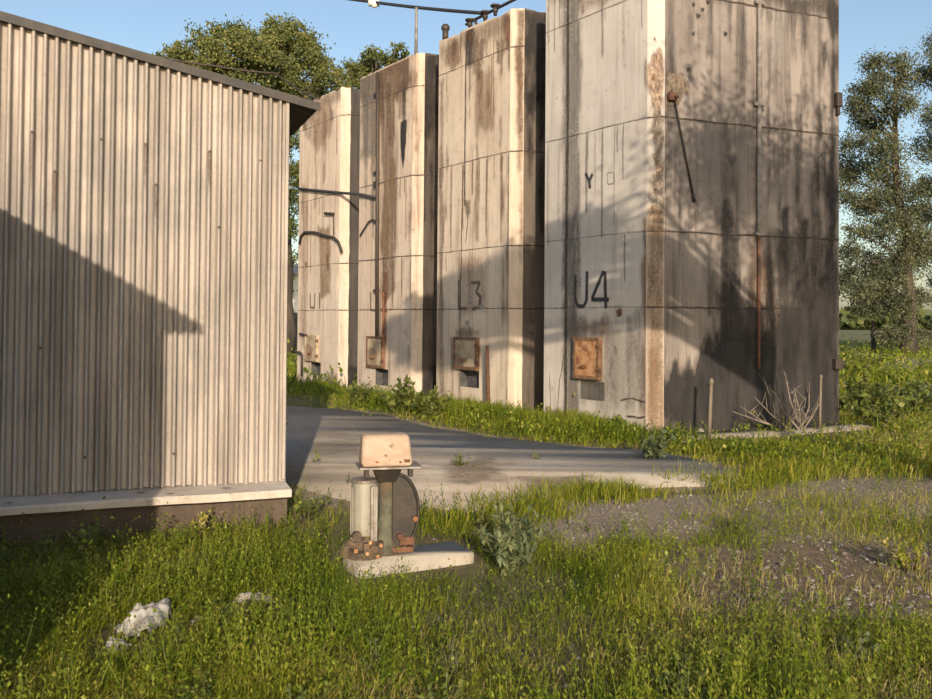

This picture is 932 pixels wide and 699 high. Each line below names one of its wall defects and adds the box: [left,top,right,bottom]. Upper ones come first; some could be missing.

water stain [360,0,588,414]
rust [641,207,663,434]
water stain [664,118,839,433]
water stain [785,0,839,110]